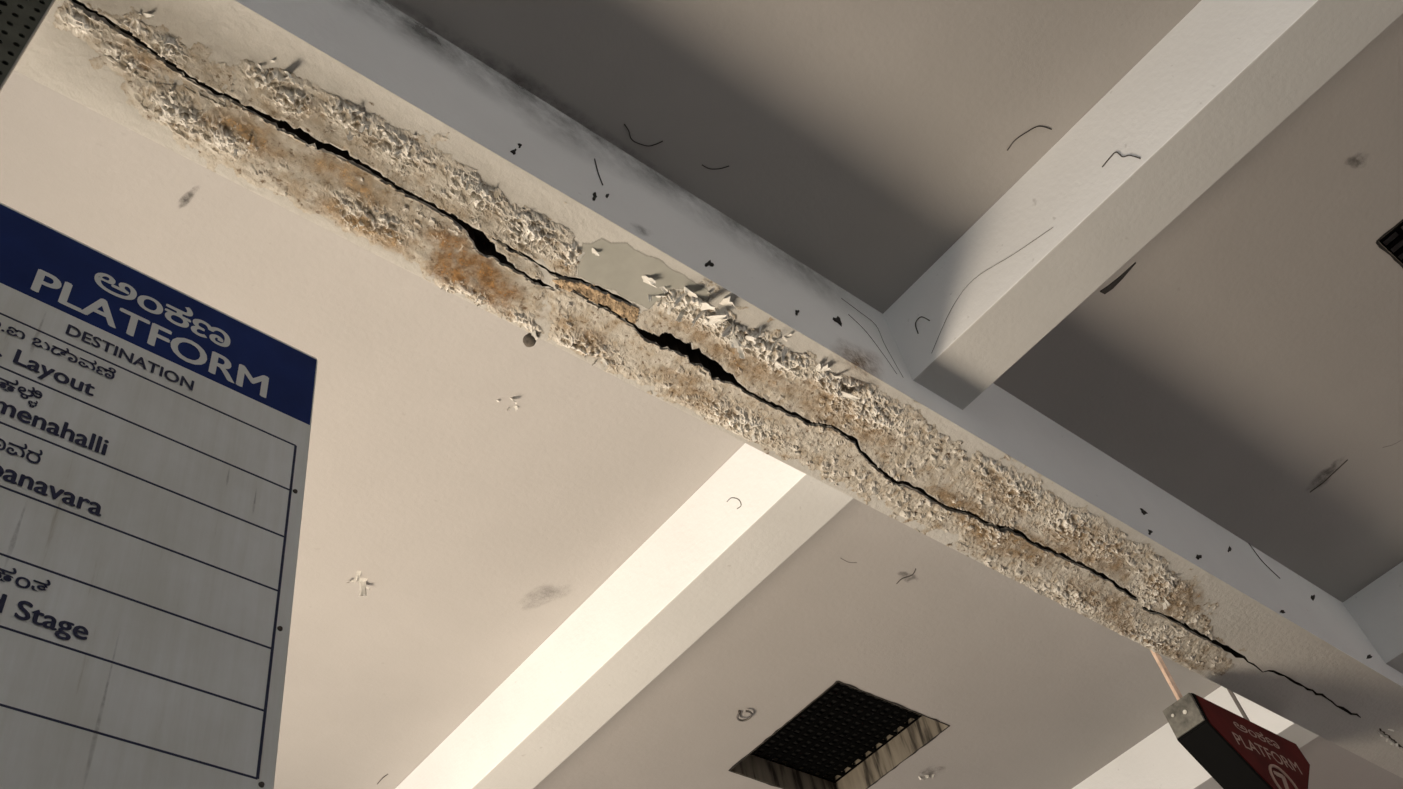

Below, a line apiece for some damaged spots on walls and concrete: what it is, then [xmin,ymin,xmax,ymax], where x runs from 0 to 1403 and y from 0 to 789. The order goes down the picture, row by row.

crack [72,0,632,304]
rust [435,233,516,307]
peeling [52,0,1246,685]
crack [598,303,1361,718]